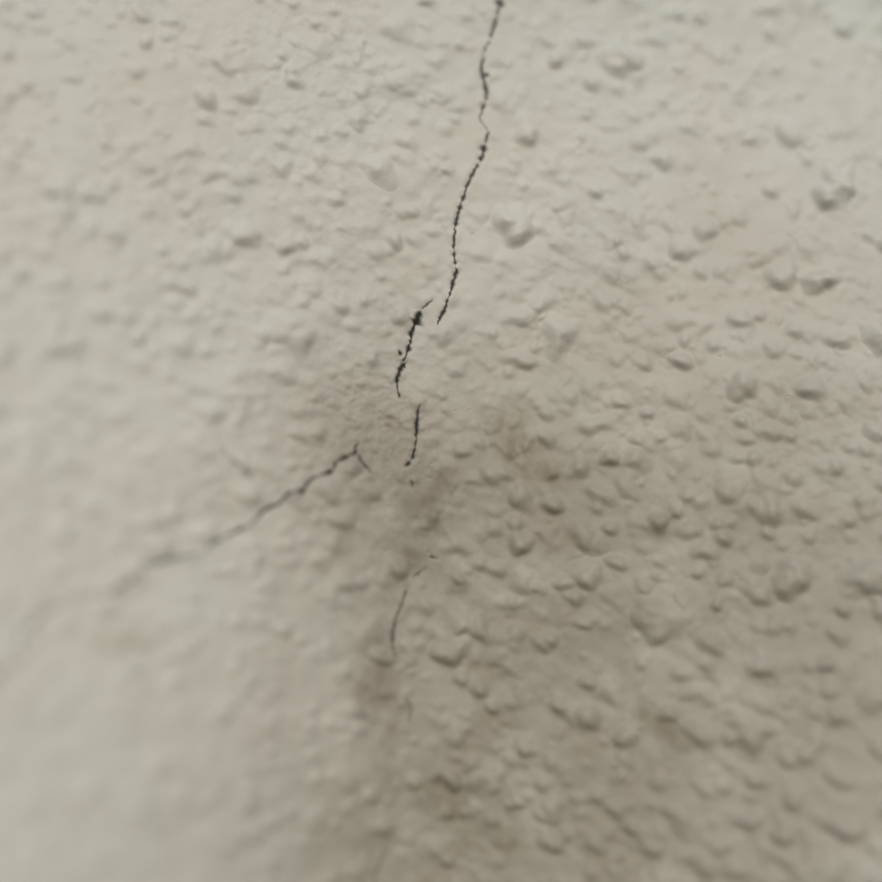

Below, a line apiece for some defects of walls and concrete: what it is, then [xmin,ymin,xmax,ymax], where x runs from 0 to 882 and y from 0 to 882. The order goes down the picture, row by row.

crack [395,0,504,485]
crack [0,444,372,673]
crack [391,556,436,654]